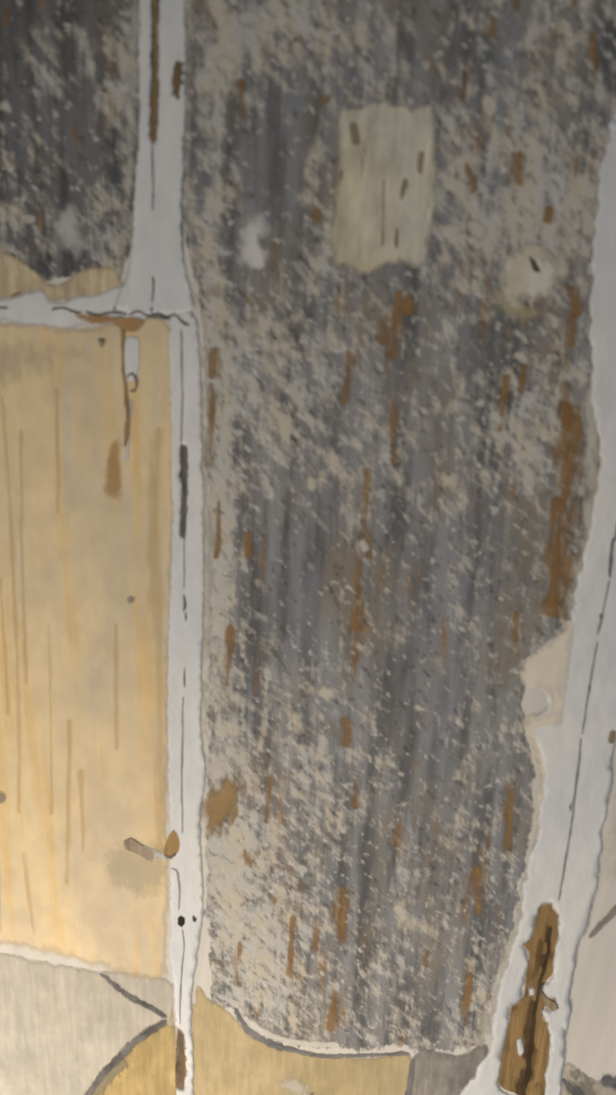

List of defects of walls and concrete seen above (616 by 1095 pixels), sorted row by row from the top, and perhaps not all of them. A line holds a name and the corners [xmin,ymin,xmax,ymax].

damp [350,122,359,145]
peeling [172,0,616,1052]
spalling [123,830,180,862]